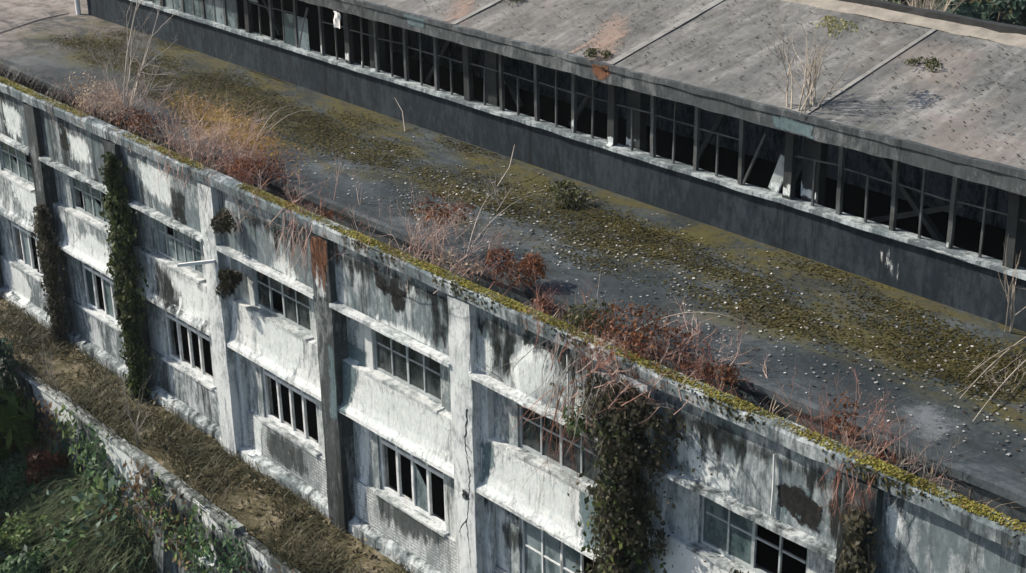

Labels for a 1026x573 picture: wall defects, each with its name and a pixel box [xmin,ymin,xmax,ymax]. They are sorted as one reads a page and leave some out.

corrosion [570,16,627,80]
corrosion [309,235,338,291]
damp [336,253,449,348]
damp [467,315,598,377]
crack [459,409,472,556]
damp [668,399,853,538]